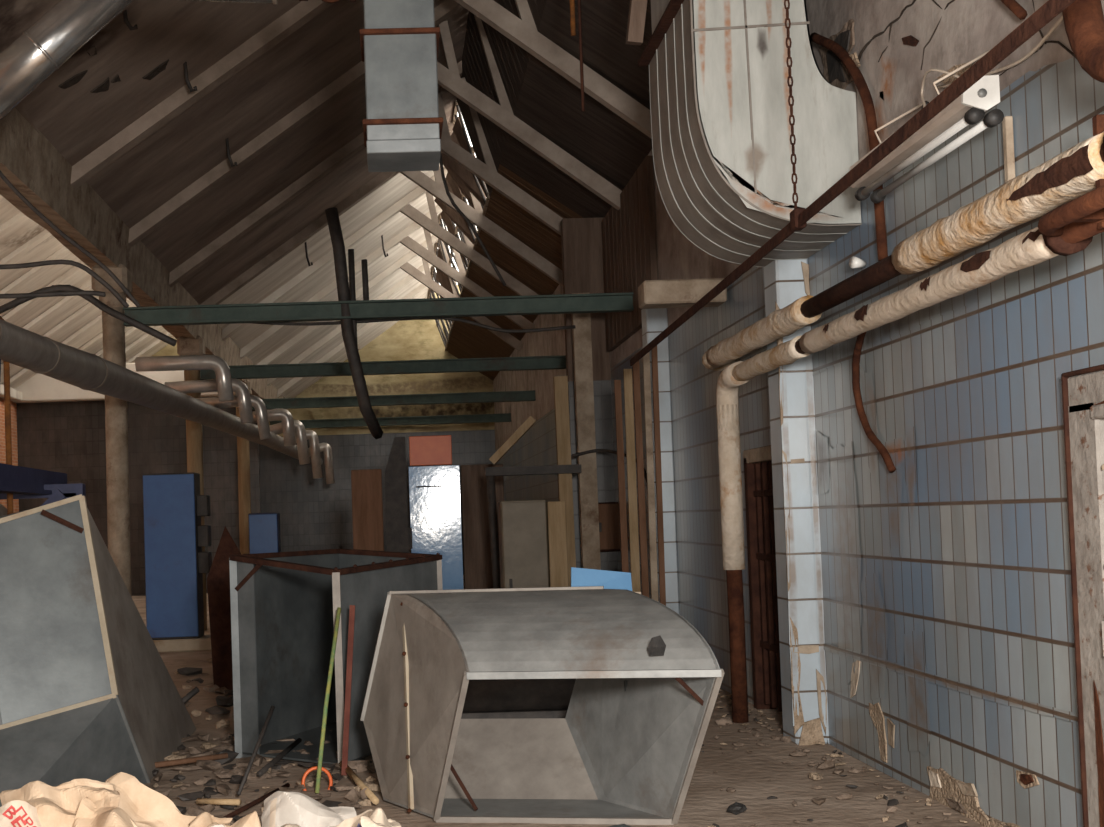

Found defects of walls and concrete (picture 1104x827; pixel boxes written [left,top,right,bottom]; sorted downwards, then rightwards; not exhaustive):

crack [858,0,955,70]
spalling [927,766,1020,827]
spalling [1016,770,1040,789]
peeling [1093,681,1104,827]